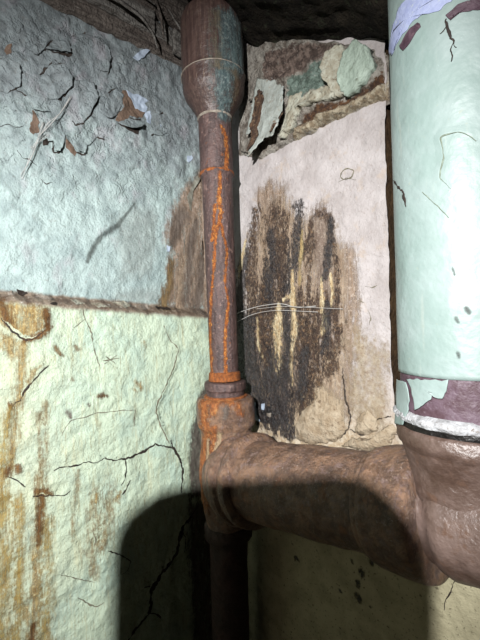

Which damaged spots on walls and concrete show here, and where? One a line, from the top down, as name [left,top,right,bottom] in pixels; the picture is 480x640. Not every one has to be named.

crack [45,36,115,156]
peeling [23,63,171,156]
peeling [133,49,150,61]
spalling [239,0,480,160]
water stain [159,170,208,317]
crack [0,317,47,341]
crack [9,361,49,406]
water stain [236,181,388,443]
crack [339,368,364,439]
peeling [394,378,449,425]
rust [0,299,55,640]
crack [52,323,198,640]